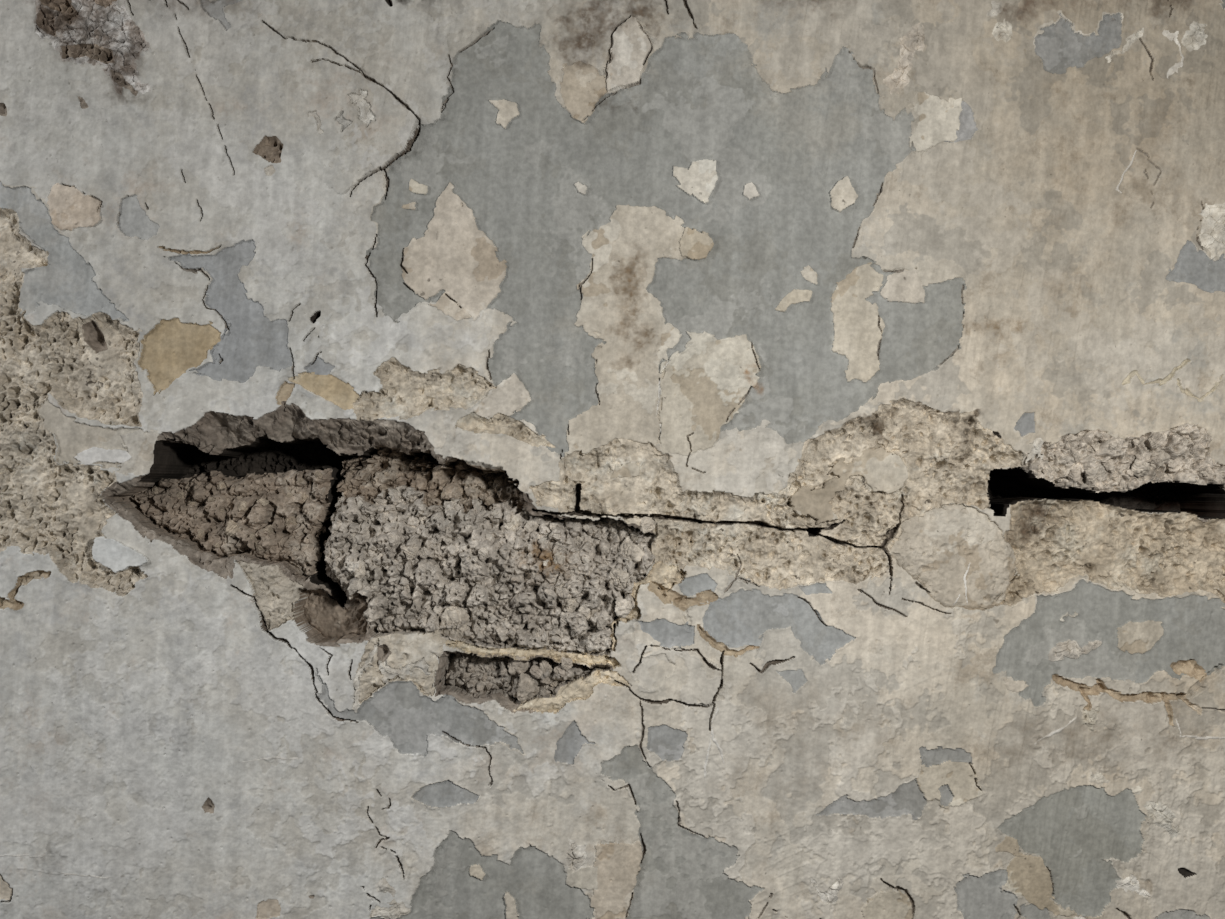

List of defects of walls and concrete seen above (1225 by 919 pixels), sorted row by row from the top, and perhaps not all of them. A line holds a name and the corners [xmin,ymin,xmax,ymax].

spalling [34,0,151,96]
spalling [253,135,283,176]
spalling [307,89,376,134]
peeling [366,10,1225,707]
spalling [0,180,717,757]
crack [532,483,950,617]
peeling [370,720,764,919]
peeling [816,746,983,821]
peeling [952,771,1181,919]